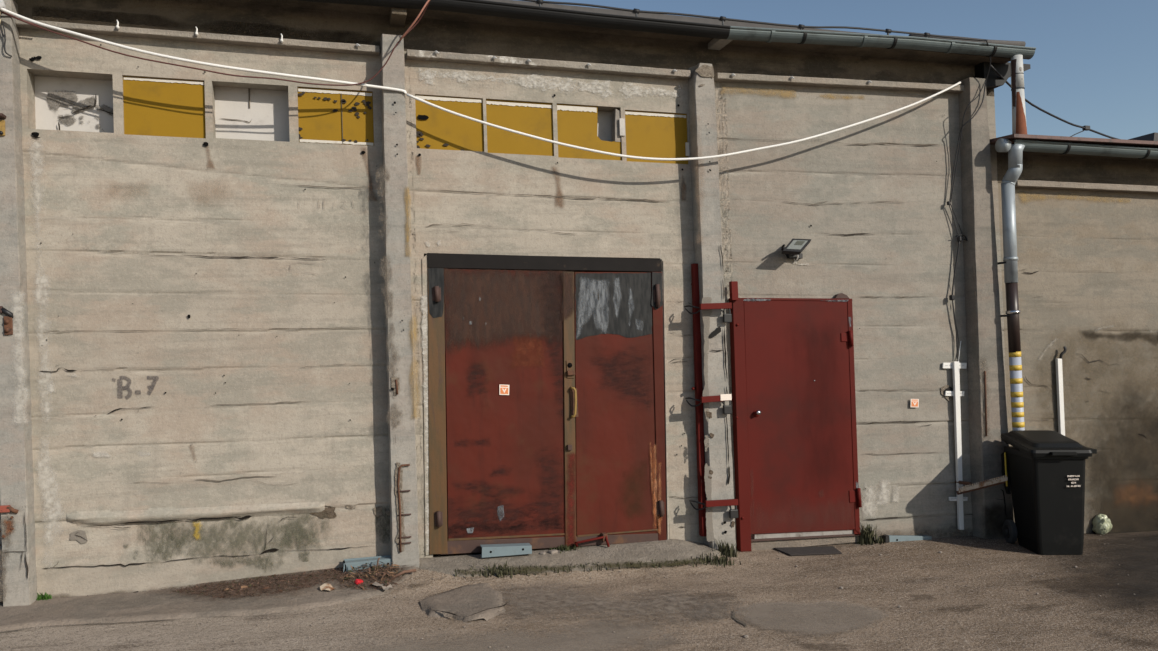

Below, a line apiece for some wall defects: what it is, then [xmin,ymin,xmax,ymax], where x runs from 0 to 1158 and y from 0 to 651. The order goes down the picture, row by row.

spalling [47,91,113,128]
spalling [309,505,356,519]